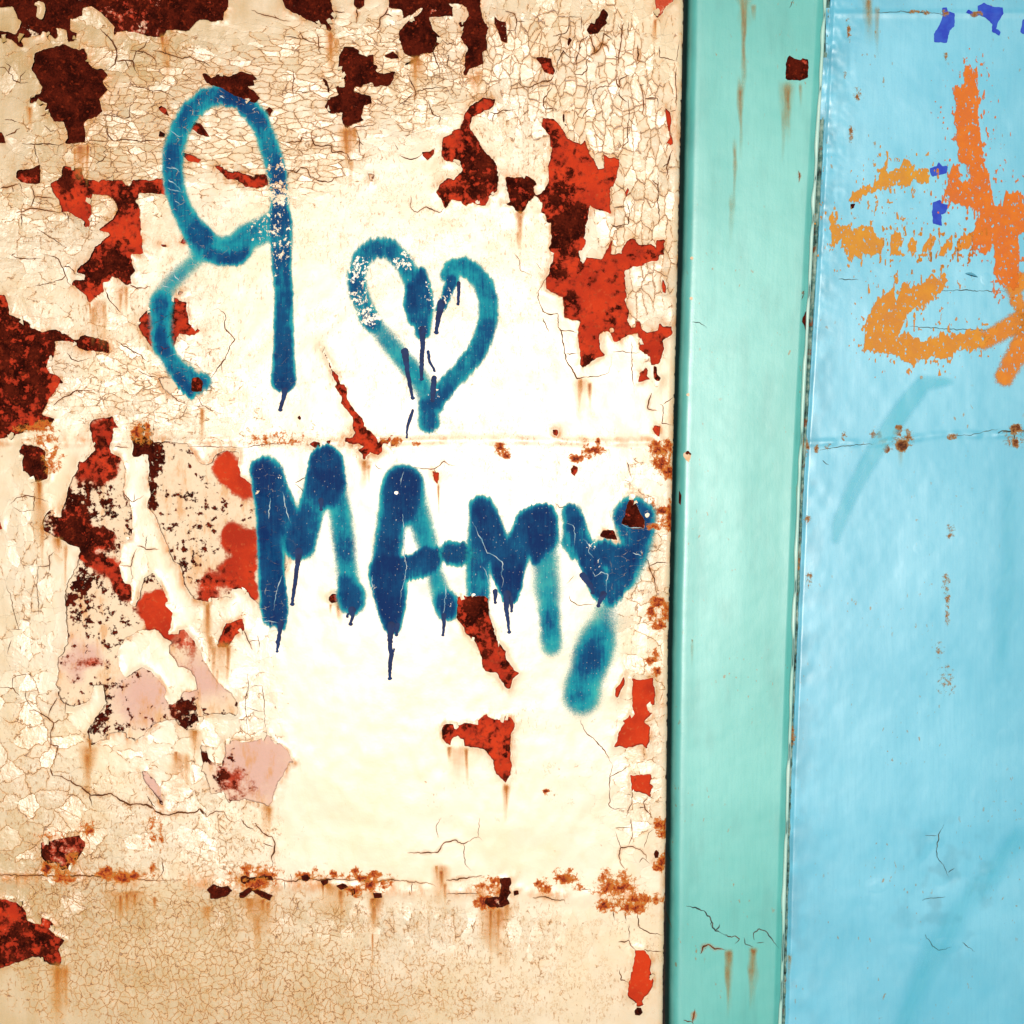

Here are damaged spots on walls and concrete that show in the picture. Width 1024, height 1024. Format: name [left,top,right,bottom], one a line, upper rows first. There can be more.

crack [1,113,78,286]
peeling [0,0,228,144]
crack [90,30,208,203]
peeling [422,98,673,382]
crack [491,16,680,158]
peeling [0,295,109,483]
peeling [42,416,260,745]
crack [0,674,483,894]
corrosion [95,862,156,910]
corrosion [204,864,392,918]
corrosion [472,875,519,929]
corrosion [533,867,665,916]